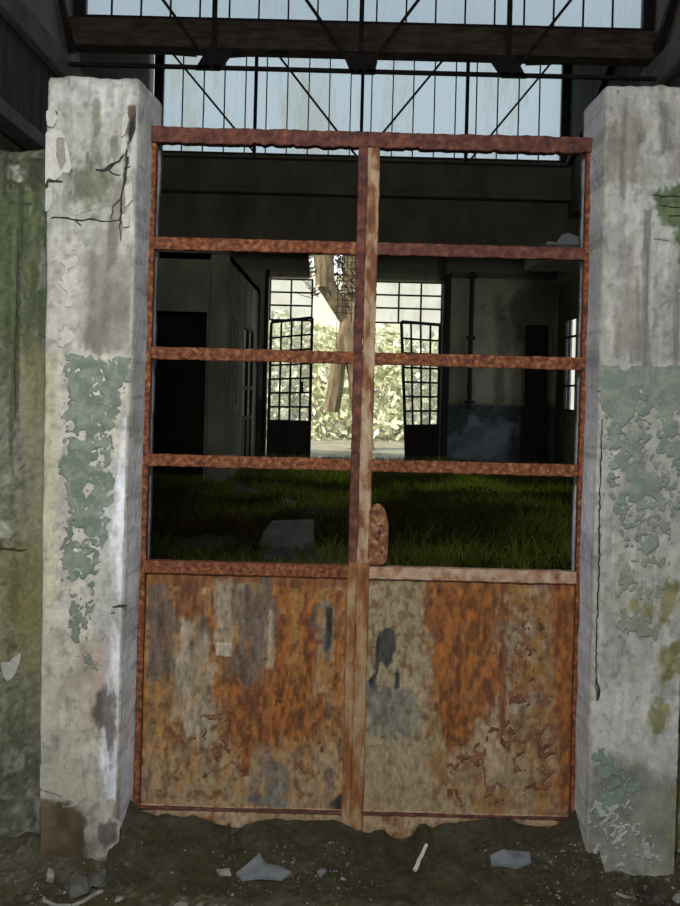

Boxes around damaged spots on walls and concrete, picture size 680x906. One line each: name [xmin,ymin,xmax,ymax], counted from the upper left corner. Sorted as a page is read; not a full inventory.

damp [0,157,48,489]
flaking render [45,107,72,212]
flaking render [58,241,82,313]
crack [51,149,130,241]
damp [0,516,15,542]
crack [0,545,26,553]
peeling [57,326,132,674]
peeling [597,364,680,641]
rust [194,576,348,778]
rust [419,580,556,807]